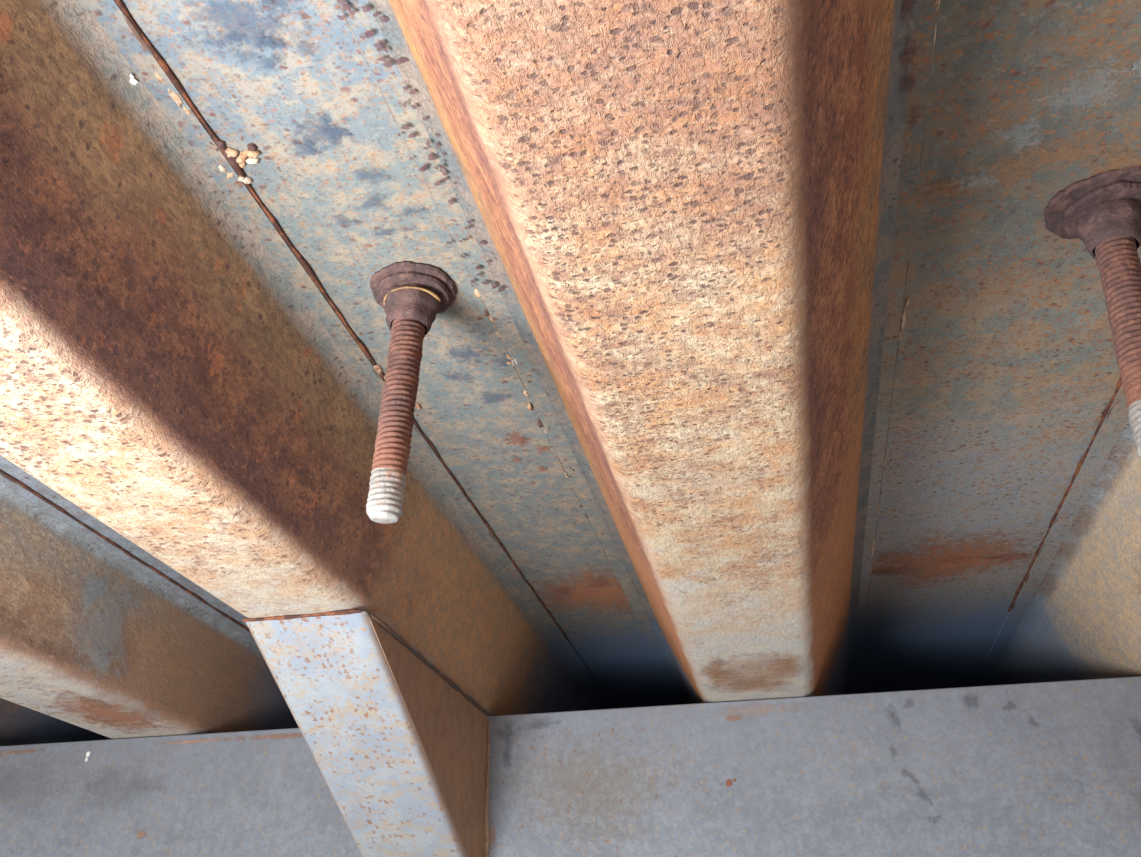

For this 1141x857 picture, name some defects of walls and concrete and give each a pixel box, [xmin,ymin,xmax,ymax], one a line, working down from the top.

rust [337,0,409,67]
rust [397,124,449,186]
rust [446,220,504,292]